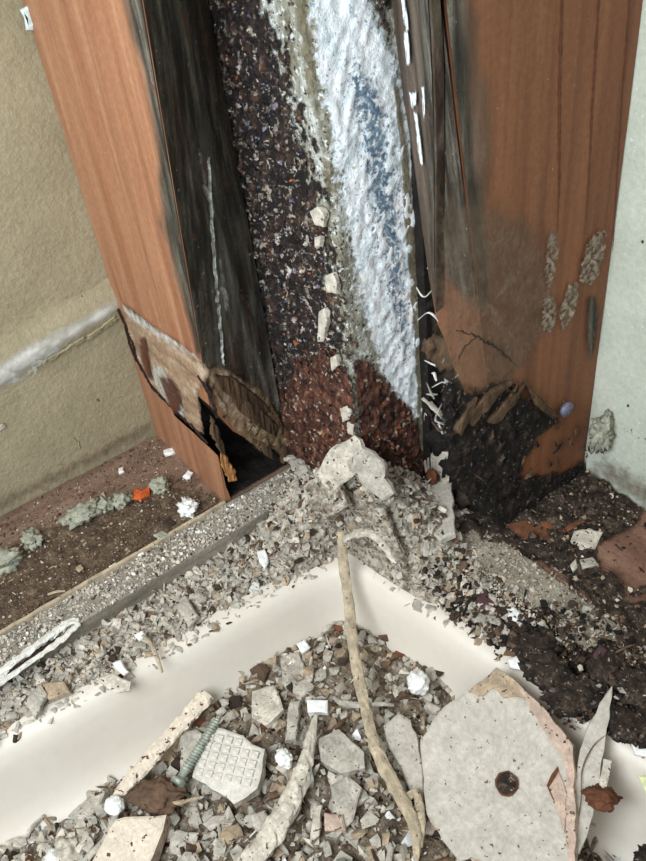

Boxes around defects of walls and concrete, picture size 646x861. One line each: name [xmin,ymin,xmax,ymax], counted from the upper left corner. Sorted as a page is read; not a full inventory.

leakage [401,0,410,65]
leakage [295,0,321,146]
leakage [125,0,280,408]
leakage [409,0,607,531]
crack [458,330,519,367]
spalling [160,378,180,413]
peeling [220,451,237,482]